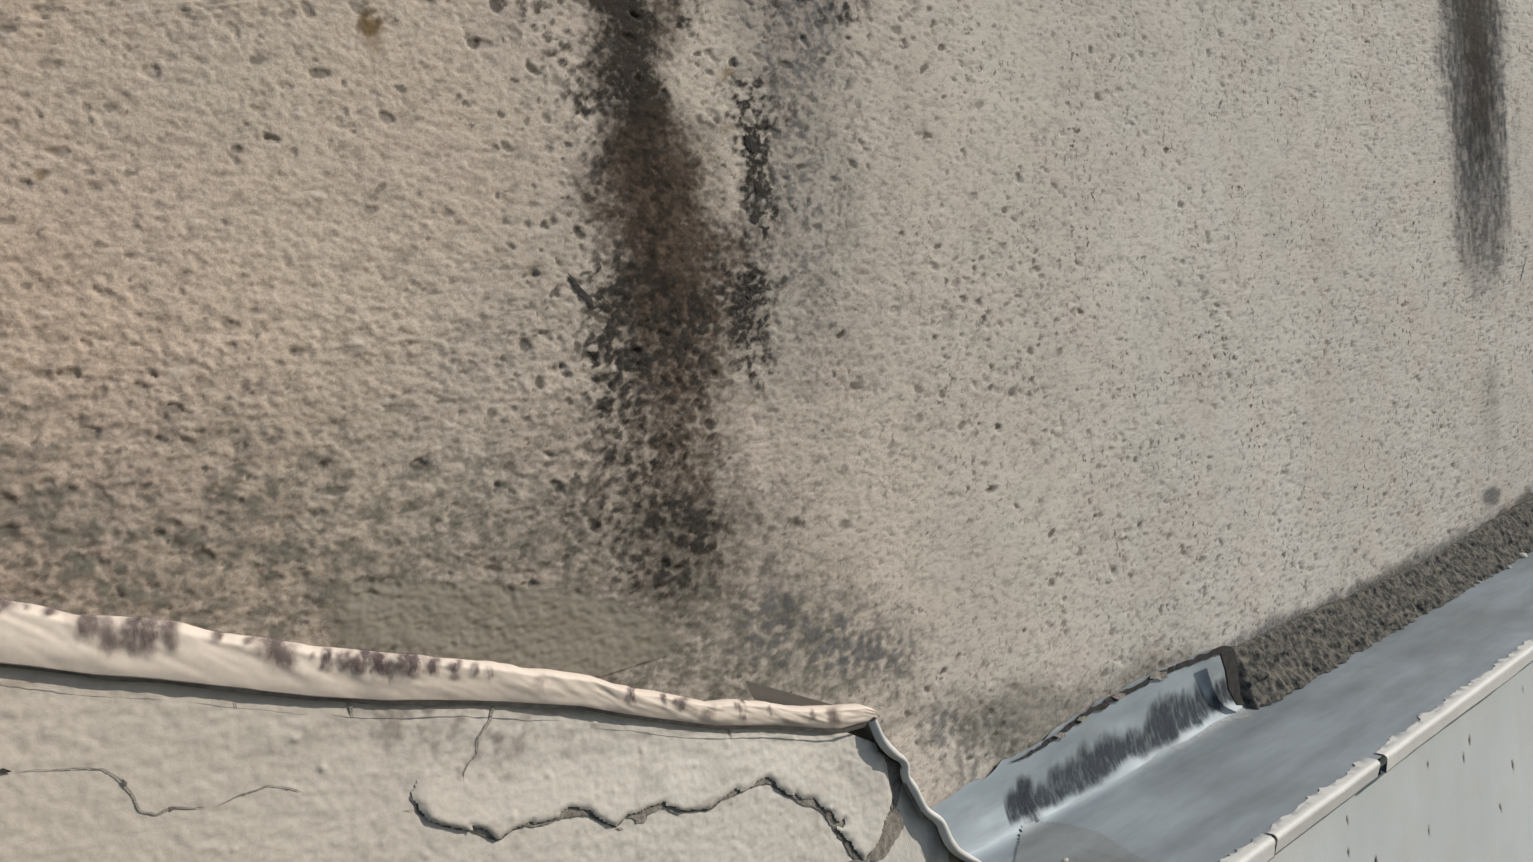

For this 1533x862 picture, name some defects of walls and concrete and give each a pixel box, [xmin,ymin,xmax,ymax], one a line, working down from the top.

damp [1441,0,1510,267]
damp [0,0,911,721]
damp [1233,488,1533,647]
crack [0,767,308,816]
crack [463,706,495,778]
crack [406,755,904,862]